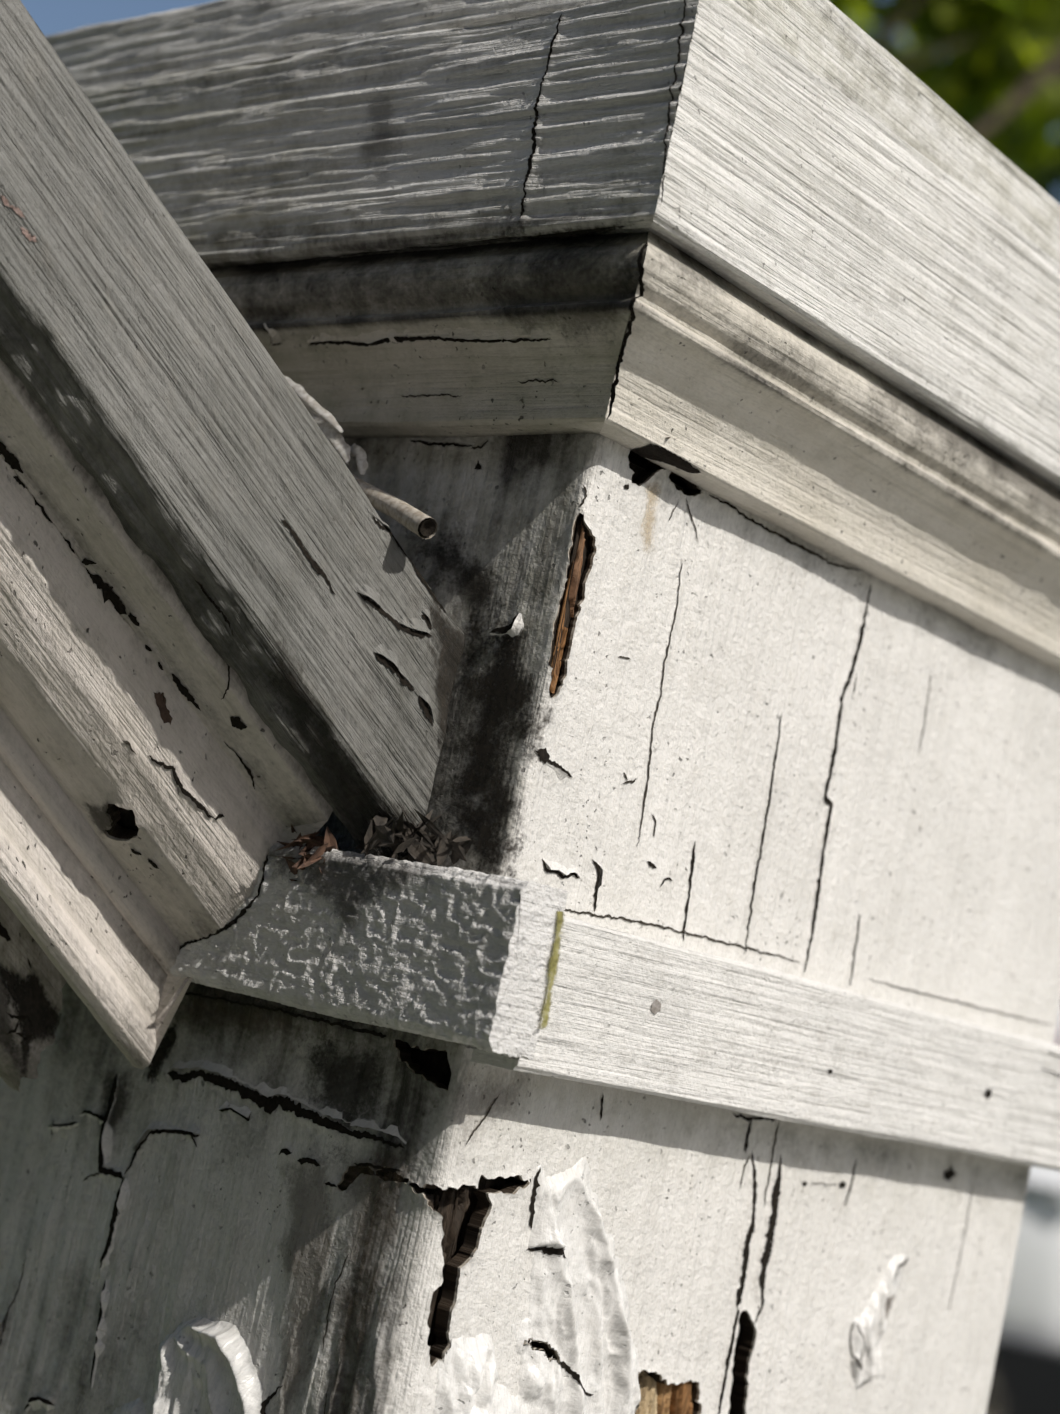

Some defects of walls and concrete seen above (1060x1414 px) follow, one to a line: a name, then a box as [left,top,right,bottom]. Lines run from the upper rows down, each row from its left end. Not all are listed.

crack [520,14,562,218]
crack [262,323,552,347]
crack [518,377,557,385]
leakage [270,649,426,923]
leakage [417,534,552,876]
crack [543,495,871,972]
leakage [309,1040,382,1127]
crack [850,913,1060,1077]
crack [48,1060,407,1388]
crack [719,1113,782,1414]
crack [24,1396,55,1412]
crack [260,1385,283,1414]